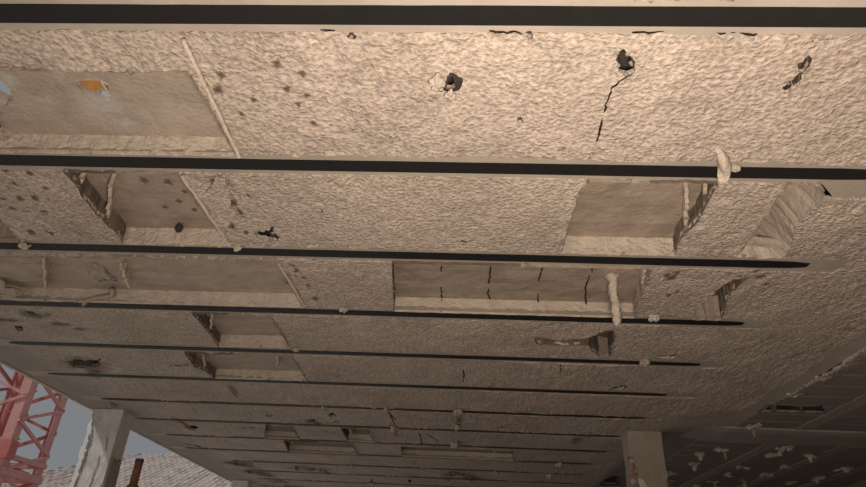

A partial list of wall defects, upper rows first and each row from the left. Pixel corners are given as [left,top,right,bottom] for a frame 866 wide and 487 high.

crack [596,76,627,142]
spalling [0,155,718,189]
spalling [730,167,866,180]
spalling [0,230,810,287]
spalling [0,297,745,326]
spalling [9,341,700,366]
spalling [47,373,667,396]
spalling [759,393,825,414]